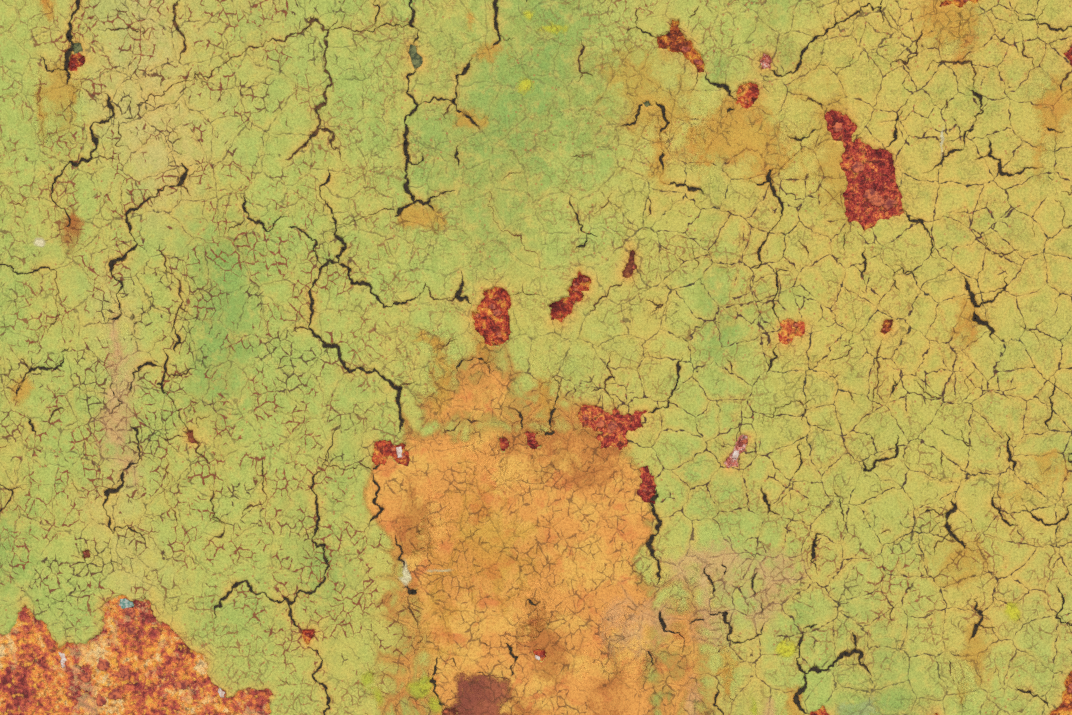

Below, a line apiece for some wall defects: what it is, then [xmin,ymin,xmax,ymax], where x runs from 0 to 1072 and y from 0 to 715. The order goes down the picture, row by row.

crack [37,0,80,141]
crack [51,0,513,543]
crack [622,101,704,218]
crack [755,0,884,374]
crack [892,20,1041,176]
crack [963,222,1035,344]
crack [214,430,384,715]
crack [395,536,518,711]
corrosion [363,333,709,715]
crack [645,489,770,671]
peeling [724,434,748,468]
crack [793,624,872,715]